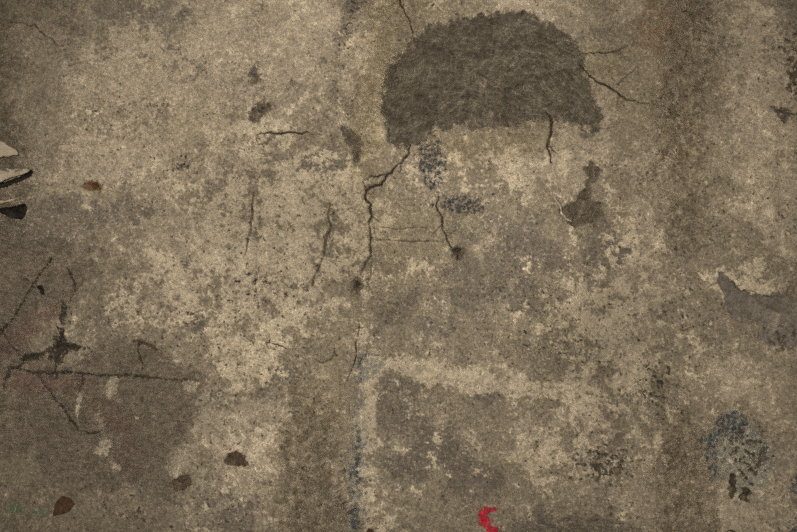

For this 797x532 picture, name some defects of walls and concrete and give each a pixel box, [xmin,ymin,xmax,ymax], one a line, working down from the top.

crack [578,43,645,105]
peeling [0,141,19,158]
crack [545,112,555,164]
peeling [0,199,27,220]
peeling [0,168,33,188]
corrosion [85,180,101,191]
crack [360,144,456,284]
peeling [717,265,797,355]
flaking render [721,429,775,502]